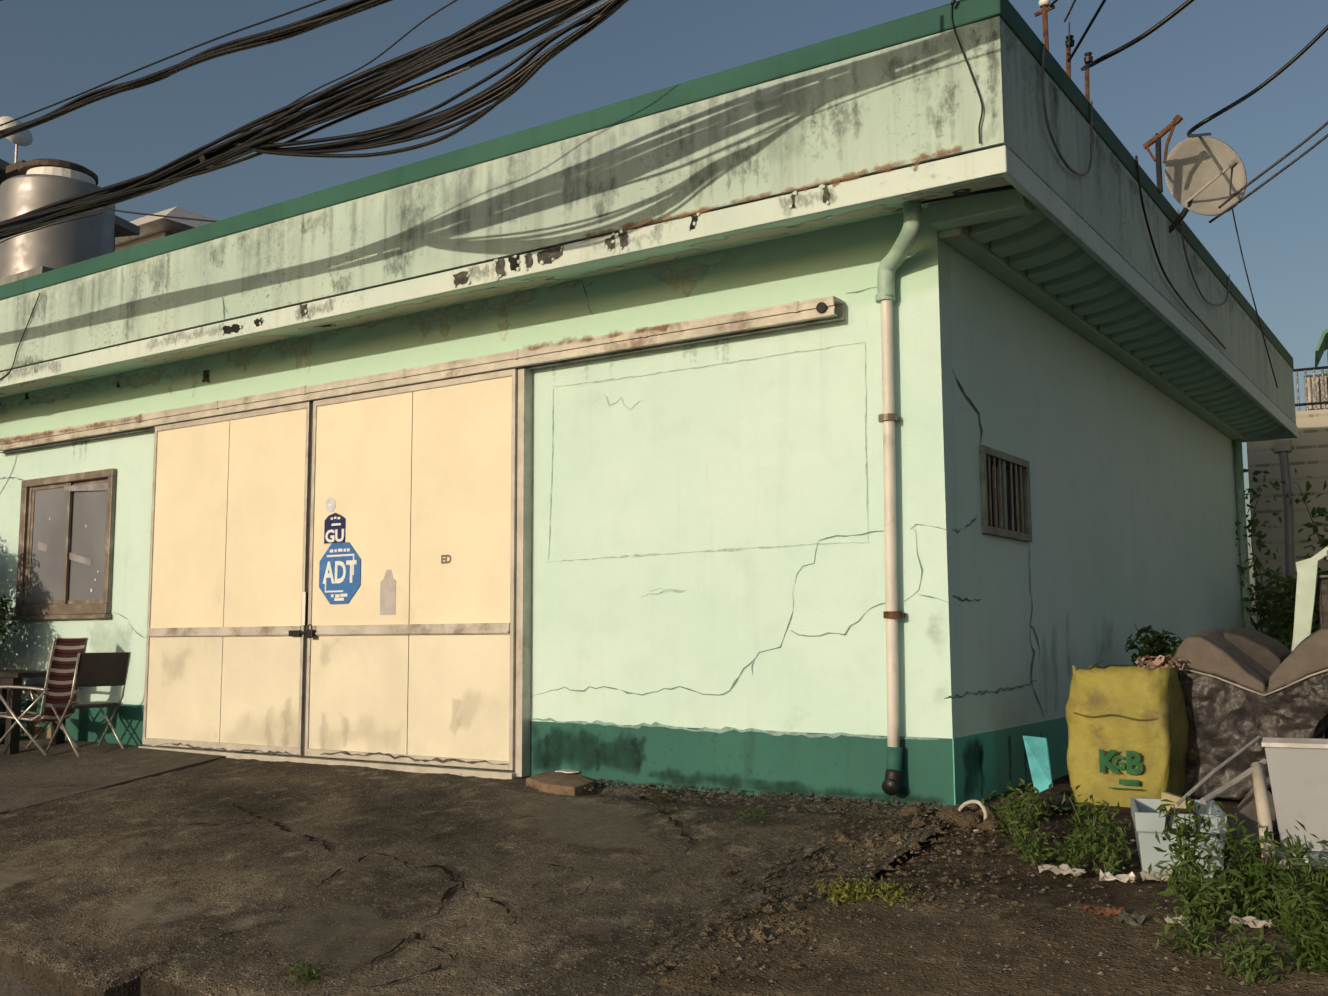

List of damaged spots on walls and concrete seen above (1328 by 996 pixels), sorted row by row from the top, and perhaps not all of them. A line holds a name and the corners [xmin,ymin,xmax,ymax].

corrosion [586,146,960,238]
peeling [585,178,1010,274]
peeling [132,245,570,382]
crack [532,342,983,697]
crack [944,554,1044,716]